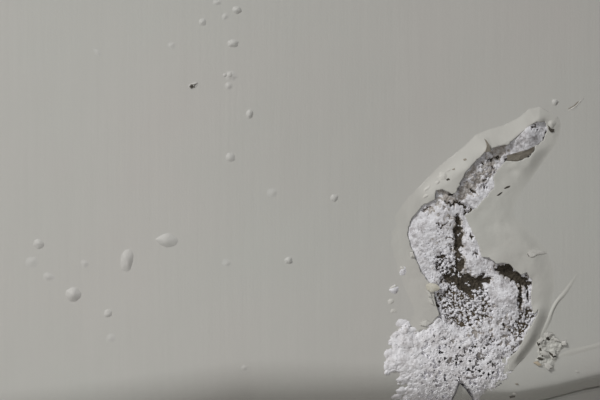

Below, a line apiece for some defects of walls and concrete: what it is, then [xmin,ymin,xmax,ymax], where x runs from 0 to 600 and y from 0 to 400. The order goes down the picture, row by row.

spalling [408,122,548,400]
damp [384,317,509,400]
peeling [533,332,567,370]